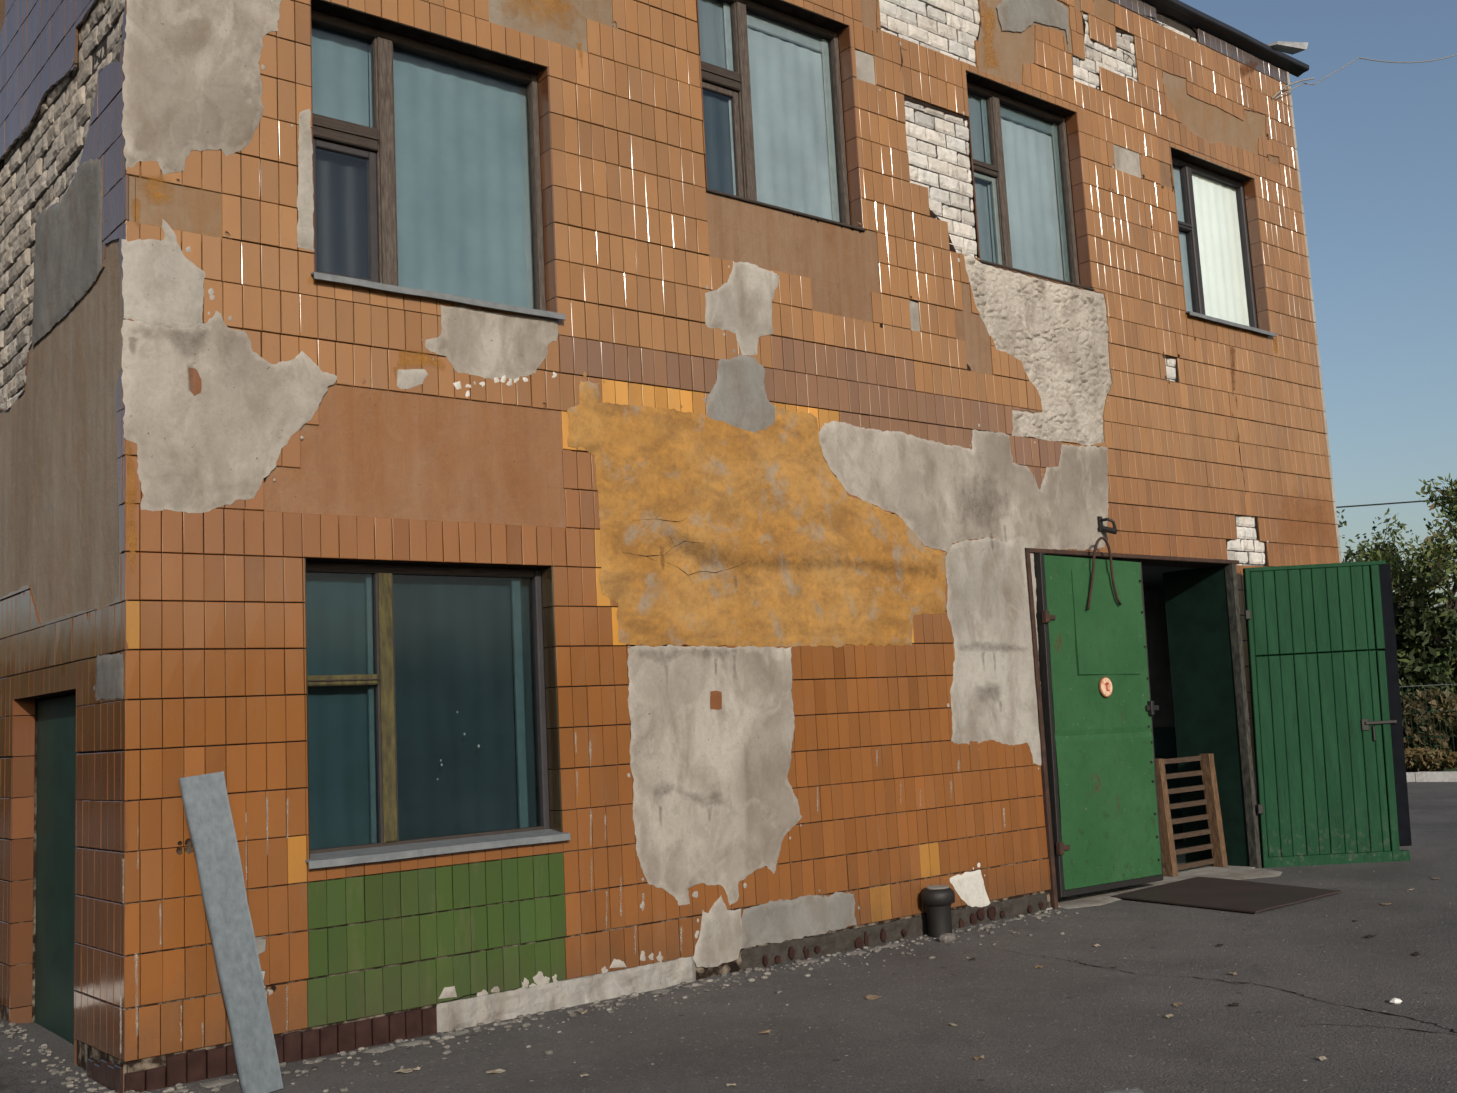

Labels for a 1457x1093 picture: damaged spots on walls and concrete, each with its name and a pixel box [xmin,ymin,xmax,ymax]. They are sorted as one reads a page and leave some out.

spalling [488,0,618,54]
spalling [859,0,1138,89]
spalling [706,192,882,323]
spalling [904,100,1114,446]
spalling [0,0,125,623]
peeling [188,367,202,396]
peeling [453,375,528,397]
peeling [710,691,722,710]
spalling [950,863,1048,929]
spalling [741,915,928,971]